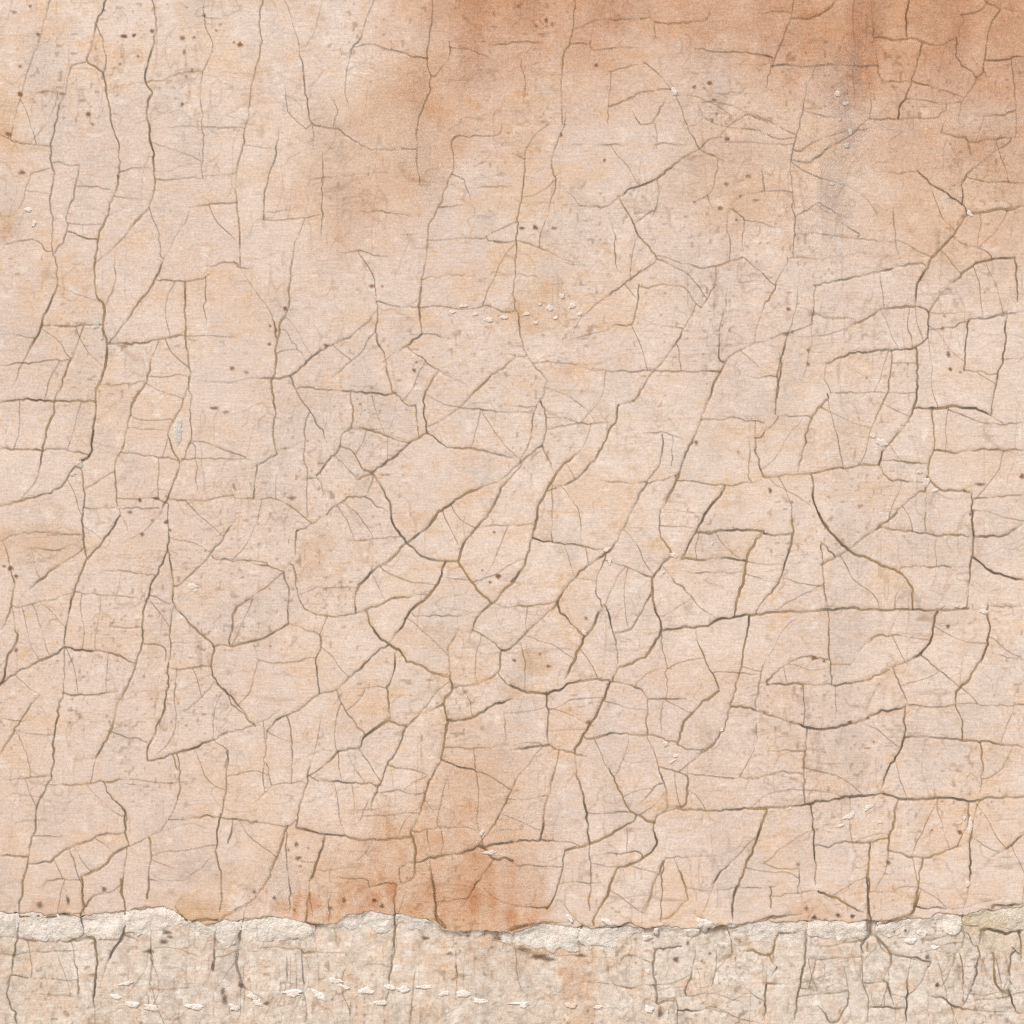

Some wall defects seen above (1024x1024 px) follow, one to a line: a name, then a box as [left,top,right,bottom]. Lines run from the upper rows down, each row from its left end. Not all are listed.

crack [69,0,119,144]
crack [144,48,171,180]
crack [744,2,1019,254]
crack [581,119,716,326]
crack [5,105,191,503]
crack [0,288,488,1024]
crack [245,170,1024,1016]
peeling [110,981,160,1011]
peeling [222,983,268,1011]
spalling [0,898,713,960]
peeling [281,978,488,1005]
spalling [726,906,1024,958]